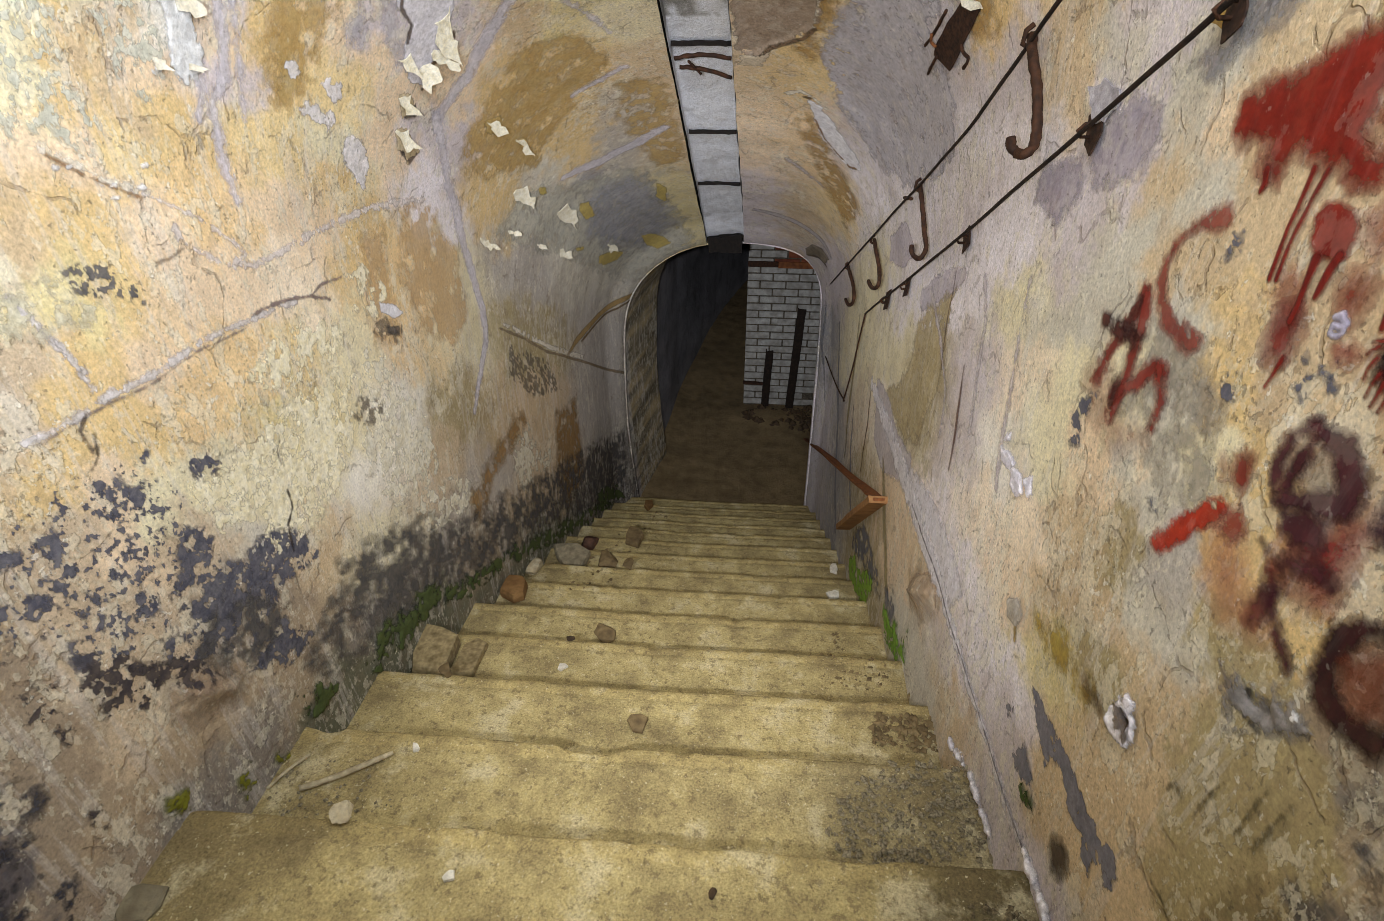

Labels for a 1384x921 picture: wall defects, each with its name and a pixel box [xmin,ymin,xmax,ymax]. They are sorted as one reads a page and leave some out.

peeling [89,0,209,102]
peeling [395,0,463,165]
peeling [484,116,535,156]
crack [37,143,424,269]
leakage [433,0,692,414]
leakage [61,263,146,305]
crack [2,277,341,464]
crack [286,490,294,551]
leakage [0,397,629,717]
leakage [21,685,71,746]
spalling [1103,694,1134,748]
flaking render [1012,686,1116,892]